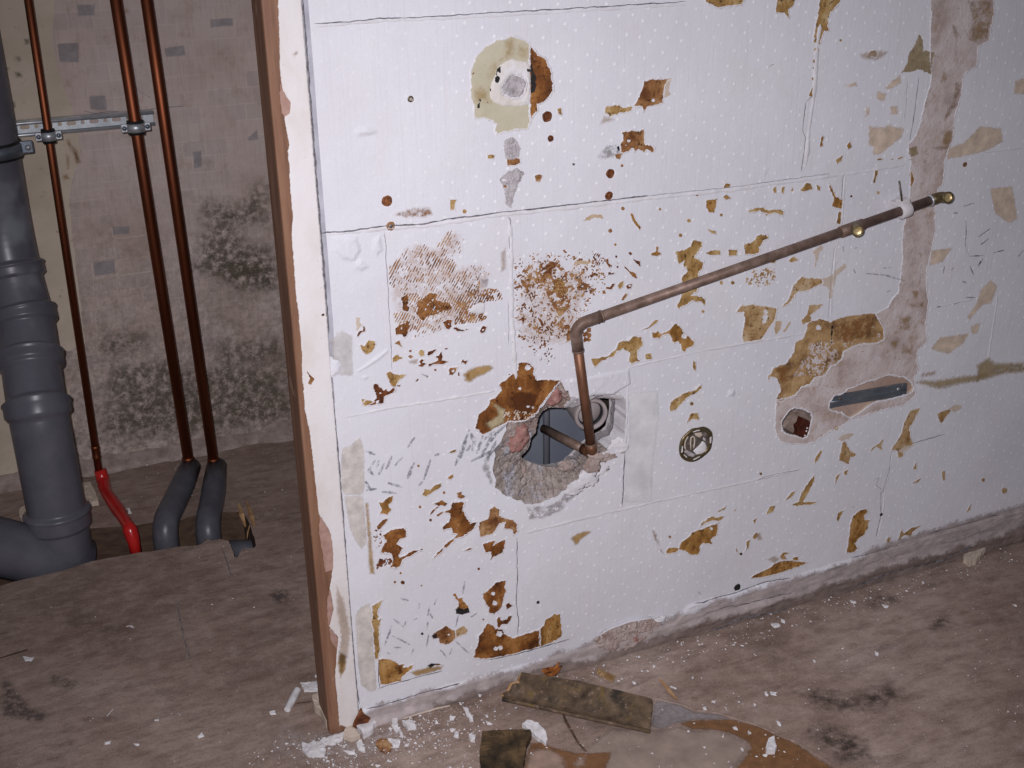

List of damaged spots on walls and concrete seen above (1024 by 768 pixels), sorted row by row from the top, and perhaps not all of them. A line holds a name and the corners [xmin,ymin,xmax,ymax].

peeling [469,34,555,208]
peeling [604,76,672,121]
mould [204,232,269,283]
corrosion [389,231,618,364]
peeling [621,207,642,232]
peeling [583,214,799,424]
peeling [696,182,731,216]
flaking render [734,0,1003,556]
mould [108,345,284,433]
spalling [366,360,629,584]
peeling [665,505,737,556]
peeling [421,580,563,660]